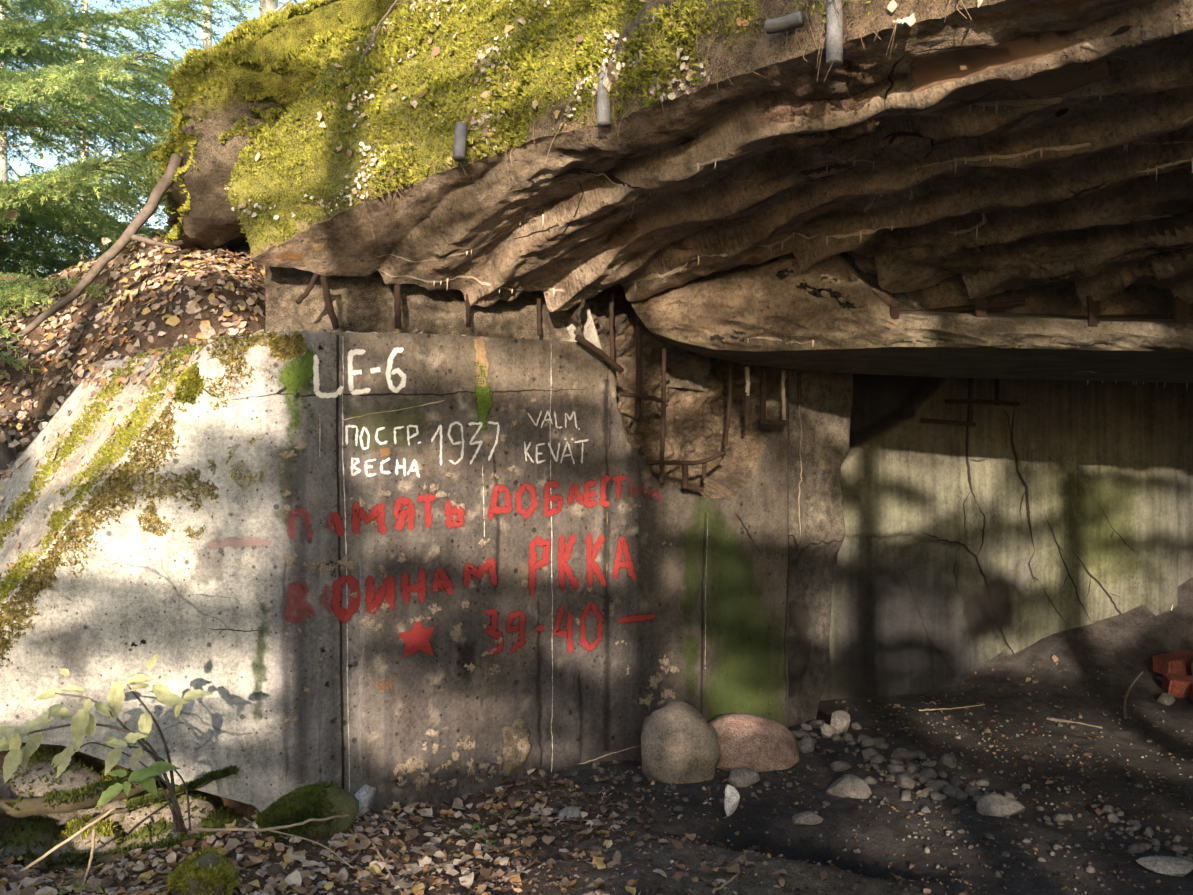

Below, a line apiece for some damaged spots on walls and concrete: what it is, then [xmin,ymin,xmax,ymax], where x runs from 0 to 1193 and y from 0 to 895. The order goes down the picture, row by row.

spalling [755,31,1111,150]
leakage [915,142,1102,174]
leakage [1136,158,1193,181]
crack [510,168,646,241]
leakage [759,194,895,249]
leakage [619,253,731,292]
crack [921,406,1122,661]